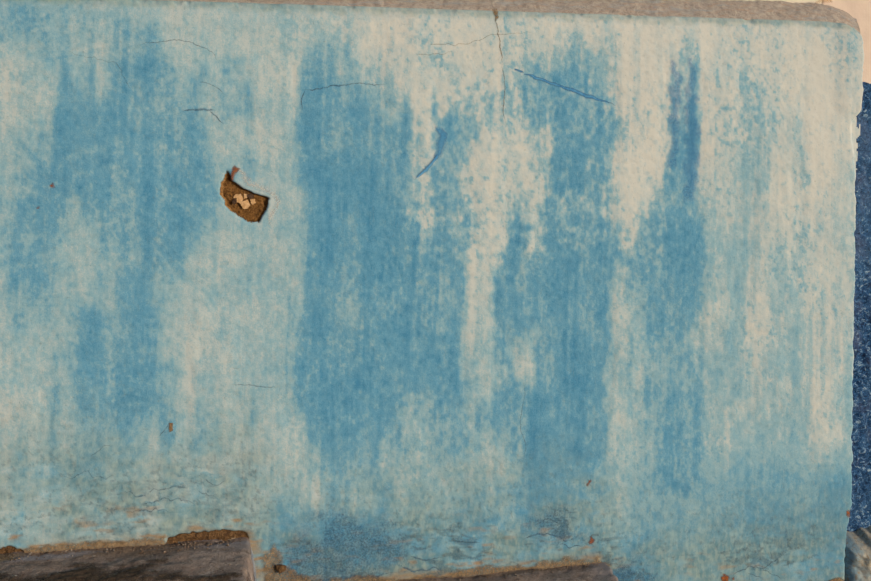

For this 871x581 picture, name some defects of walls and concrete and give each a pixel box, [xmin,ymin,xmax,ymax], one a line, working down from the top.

spalling [220,170,268,223]
peeling [110,456,257,544]
spalling [0,546,23,554]